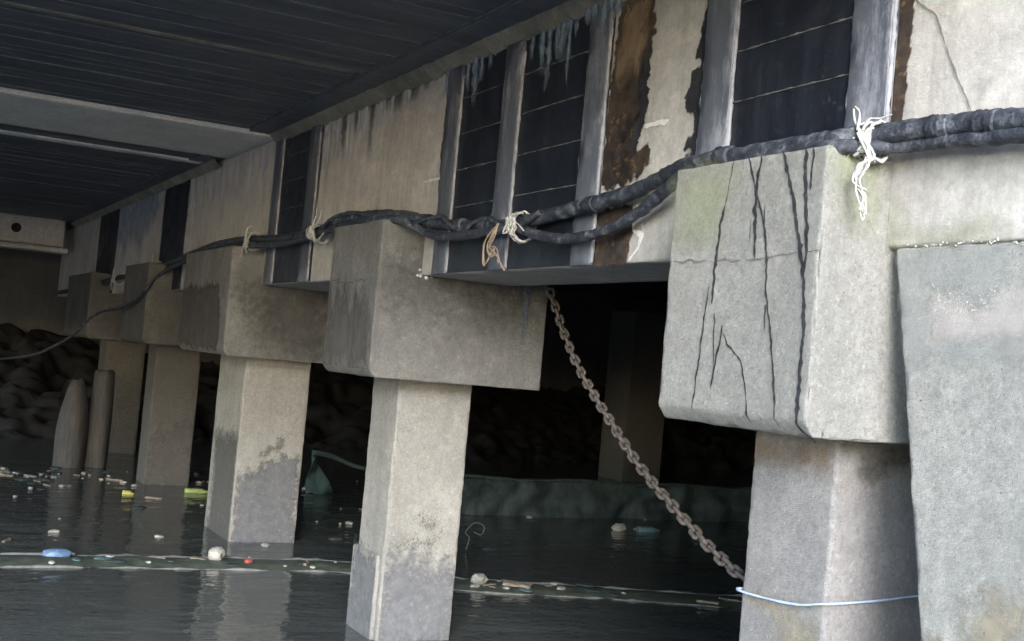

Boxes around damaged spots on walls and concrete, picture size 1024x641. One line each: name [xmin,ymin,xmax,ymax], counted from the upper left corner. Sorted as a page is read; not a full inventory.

damp [466,53,492,94]
damp [531,0,622,67]
rust [601,0,657,191]
rust [592,204,633,267]
crack [673,148,819,442]
damp [208,431,300,543]
damp [346,513,455,641]